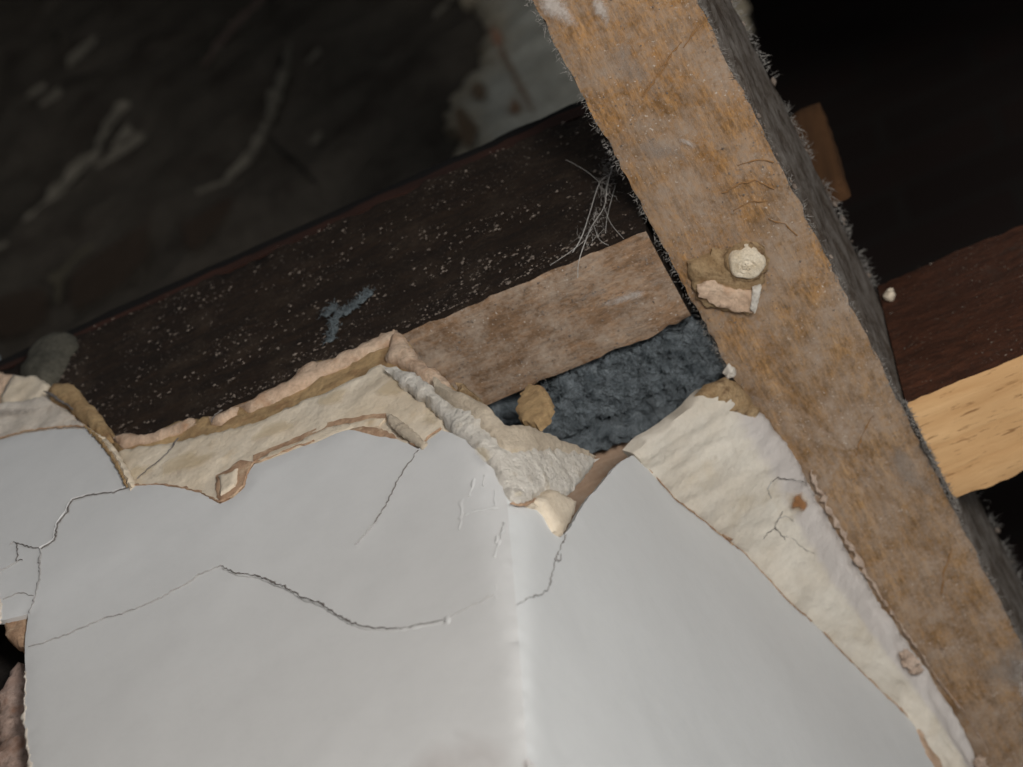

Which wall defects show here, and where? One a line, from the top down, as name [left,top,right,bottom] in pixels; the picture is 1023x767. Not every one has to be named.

crack [0,438,179,613]
crack [28,565,495,647]
flaking render [0,329,600,537]
crack [355,450,419,545]
crack [516,535,566,607]
flaking render [623,377,989,767]